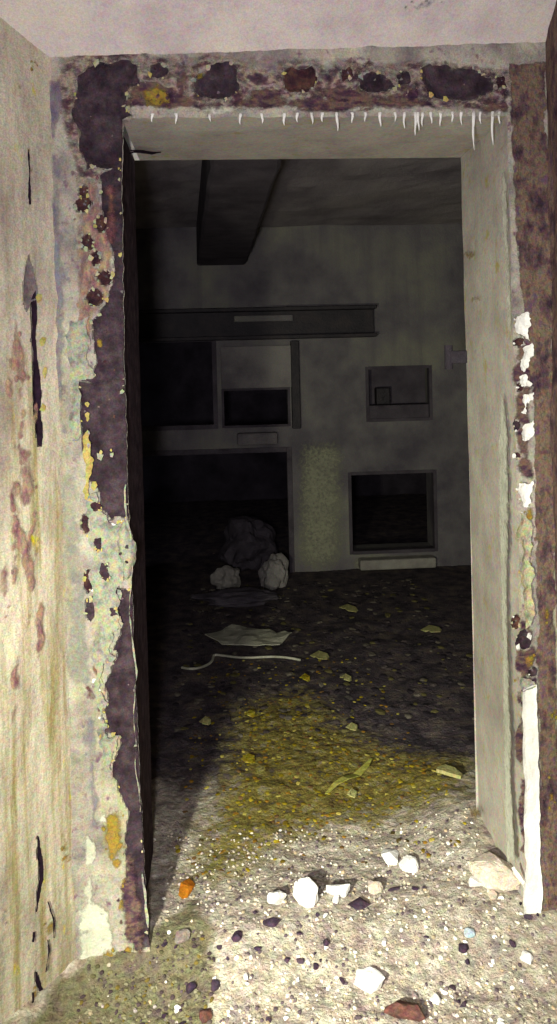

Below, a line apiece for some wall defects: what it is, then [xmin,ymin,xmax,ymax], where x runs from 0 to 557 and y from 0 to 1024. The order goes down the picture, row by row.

crack [25,149,33,205]
leakage [174,106,264,125]
corrosion [123,61,437,112]
leakage [283,107,501,147]
spalling [337,59,509,110]
corrosion [74,176,115,347]
crack [23,255,47,447]
peeling [513,312,535,441]
spalling [59,53,175,953]
corrosion [458,61,557,911]
peeling [510,479,535,651]
crack [32,836,55,1003]